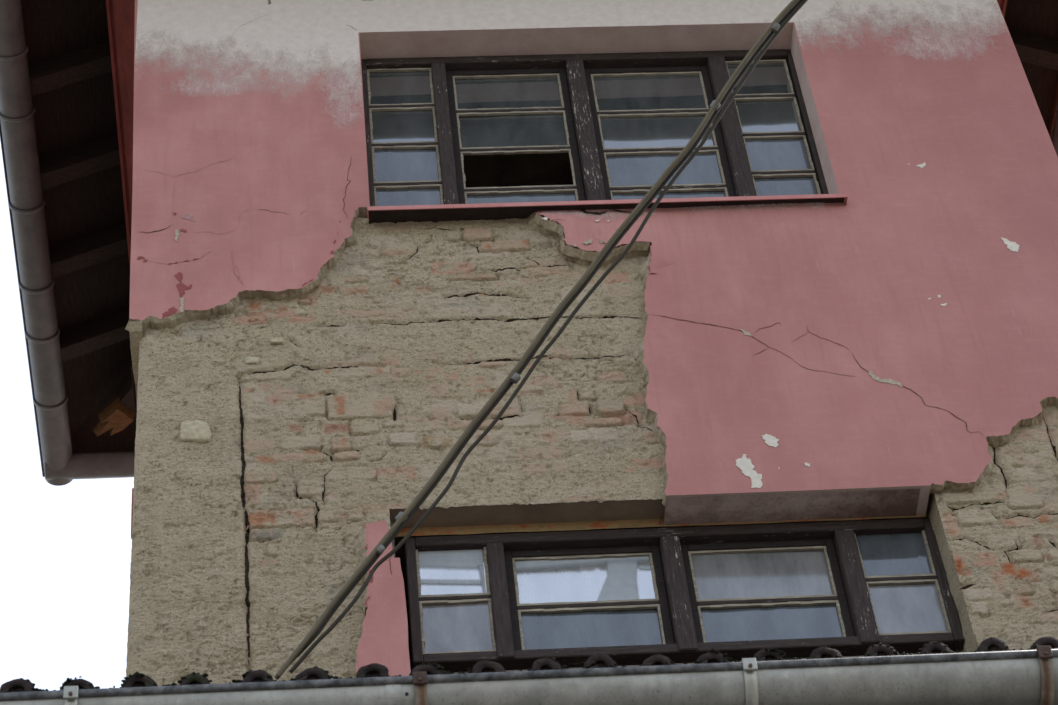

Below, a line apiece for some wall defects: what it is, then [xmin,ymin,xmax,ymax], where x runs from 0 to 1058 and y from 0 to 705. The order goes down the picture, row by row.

damp [135,0,1005,114]
peeling [1001,237,1019,252]
crack [239,340,358,671]
crack [296,450,384,528]
spalling [125,207,668,686]
peeling [736,454,763,488]
peeling [762,434,779,447]
crack [902,385,1058,520]
crack [956,538,1019,564]
spalling [925,397,1058,652]